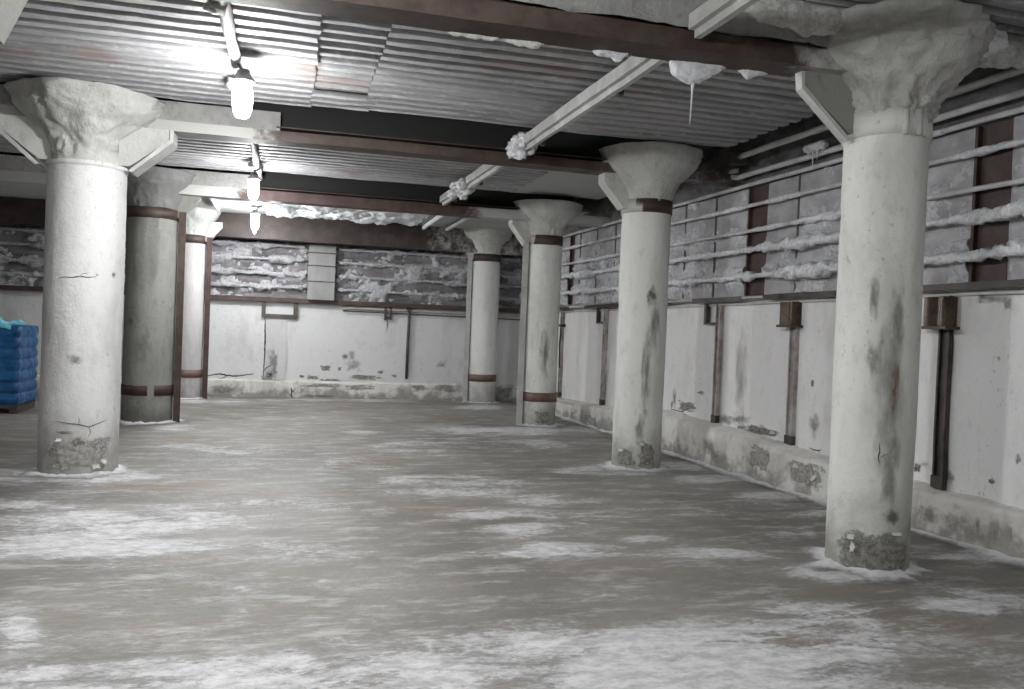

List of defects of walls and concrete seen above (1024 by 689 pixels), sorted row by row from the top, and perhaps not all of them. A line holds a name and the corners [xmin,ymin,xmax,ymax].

crack [208,317,271,379]
damp [869,301,902,425]
spalling [46,438,106,471]
spalling [618,442,654,467]
spalling [737,424,777,470]
spalling [789,461,825,488]
damp [884,456,893,496]
spalling [838,530,906,571]